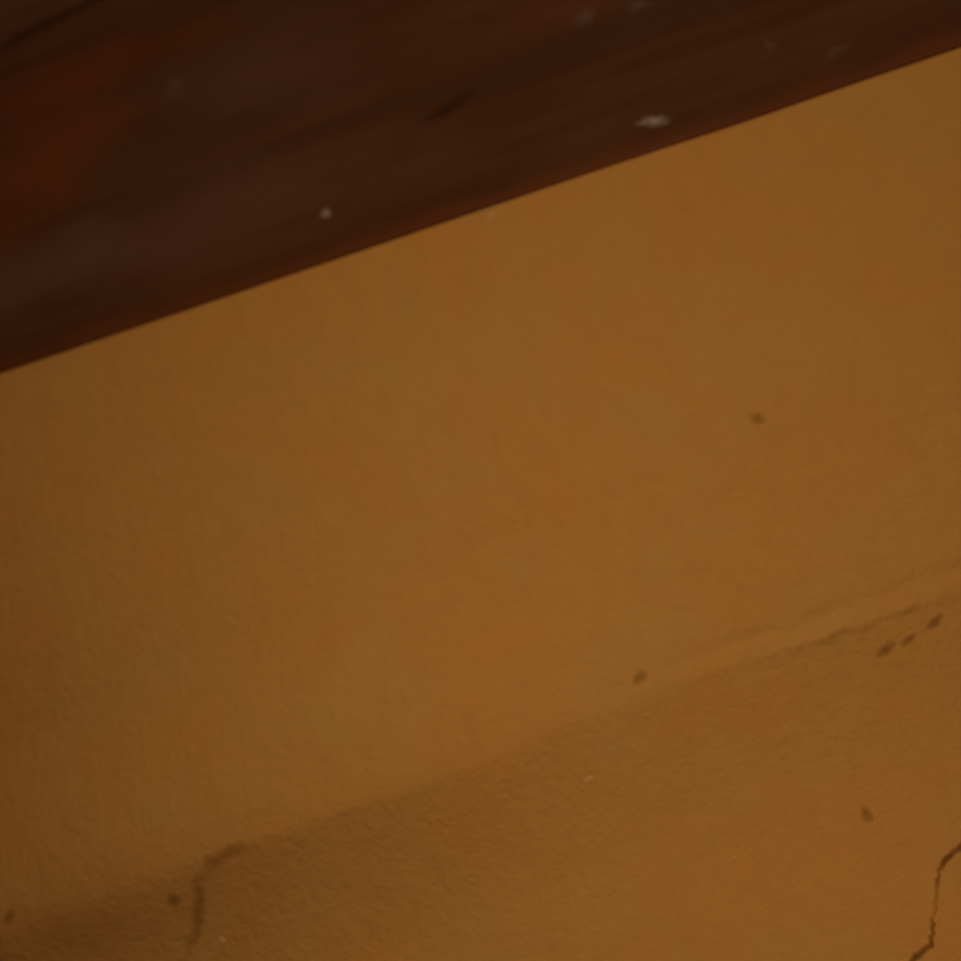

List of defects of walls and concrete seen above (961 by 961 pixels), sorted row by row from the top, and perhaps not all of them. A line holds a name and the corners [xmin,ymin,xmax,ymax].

crack [941,844,961,867]
crack [910,924,934,961]